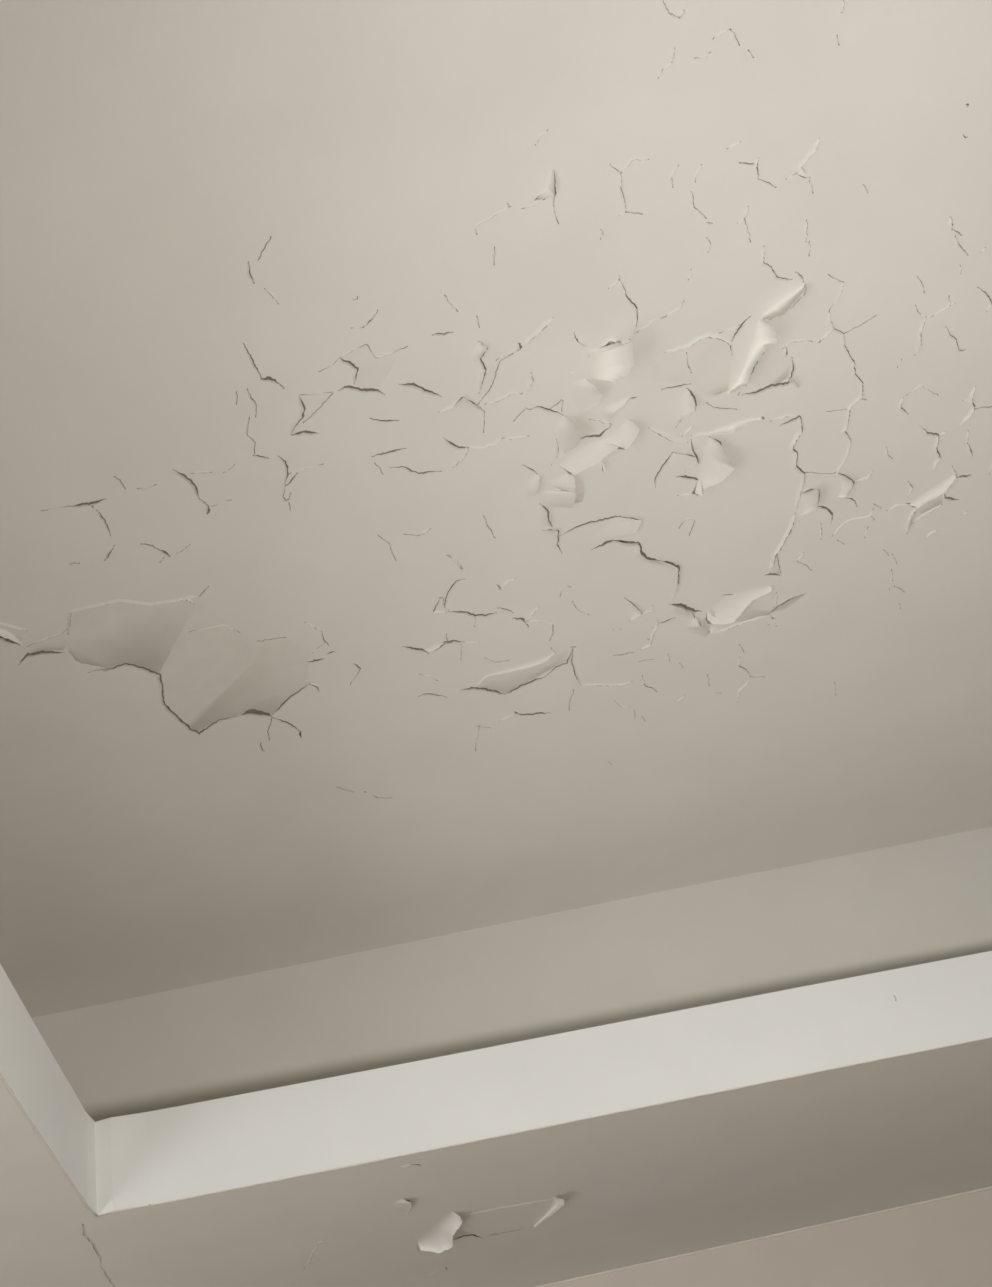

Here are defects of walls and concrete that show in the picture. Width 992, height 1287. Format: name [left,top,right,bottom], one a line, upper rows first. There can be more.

crack [246,236,279,304]
crack [433,295,480,336]
crack [599,141,877,476]
crack [897,216,992,474]
crack [398,383,442,397]
crack [41,343,323,565]
crack [370,418,459,475]
peeling [438,284,873,637]
peeling [886,466,972,535]
crack [378,528,764,752]
crack [260,717,303,751]
peeling [417,1197,564,1253]